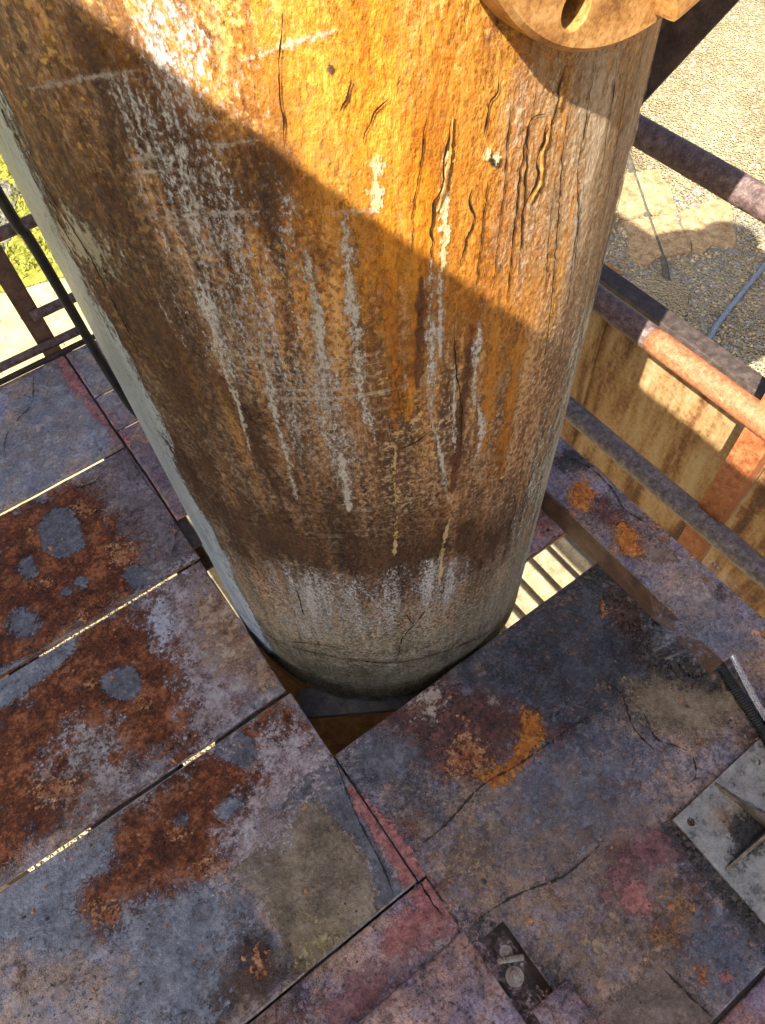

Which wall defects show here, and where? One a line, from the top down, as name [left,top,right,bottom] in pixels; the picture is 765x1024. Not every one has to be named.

crack [411,61,629,360]
corrosion [41,0,580,602]
leakage [265,519,468,639]
corrosion [568,475,646,560]
leakage [36,708,164,830]
corrosion [0,478,316,945]
leakage [125,554,508,899]
corrosion [374,675,547,800]
crack [424,680,697,843]
crack [480,844,600,917]